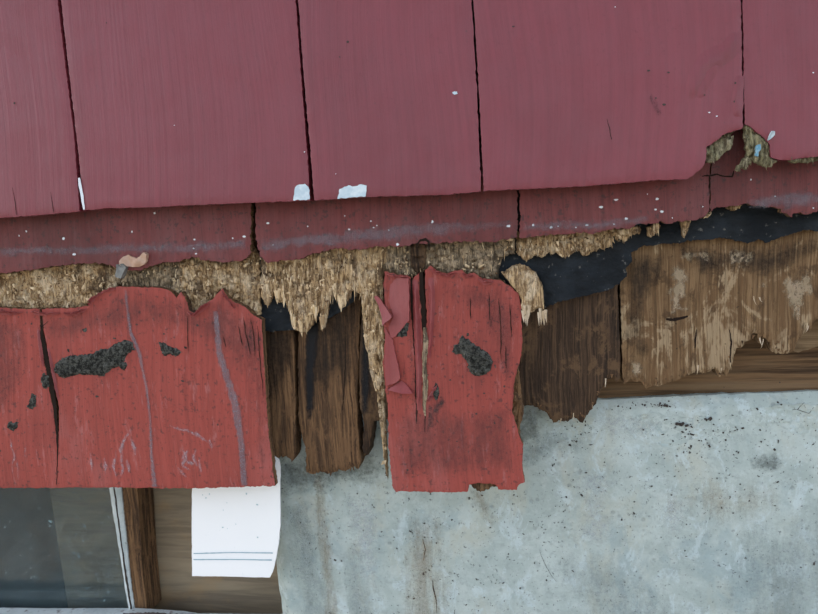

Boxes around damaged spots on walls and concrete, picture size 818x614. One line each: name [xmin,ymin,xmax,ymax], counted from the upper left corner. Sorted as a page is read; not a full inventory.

crack [37,322,59,485]
peeling [115,252,149,279]
crack [410,272,428,424]
peeling [374,268,493,410]
peeling [669,268,686,313]
peeling [783,277,812,324]